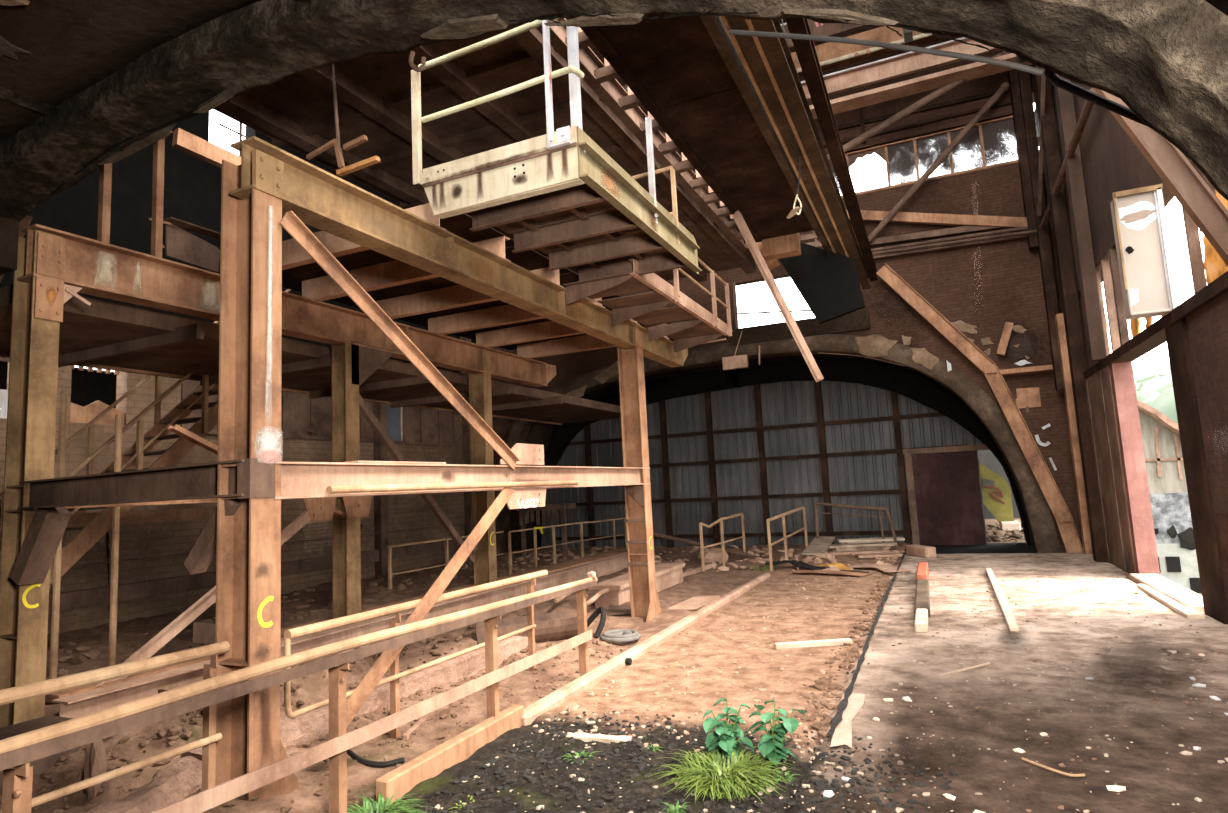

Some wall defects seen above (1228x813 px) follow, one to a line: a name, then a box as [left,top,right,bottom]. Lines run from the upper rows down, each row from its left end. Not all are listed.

peeling [855,334,952,371]